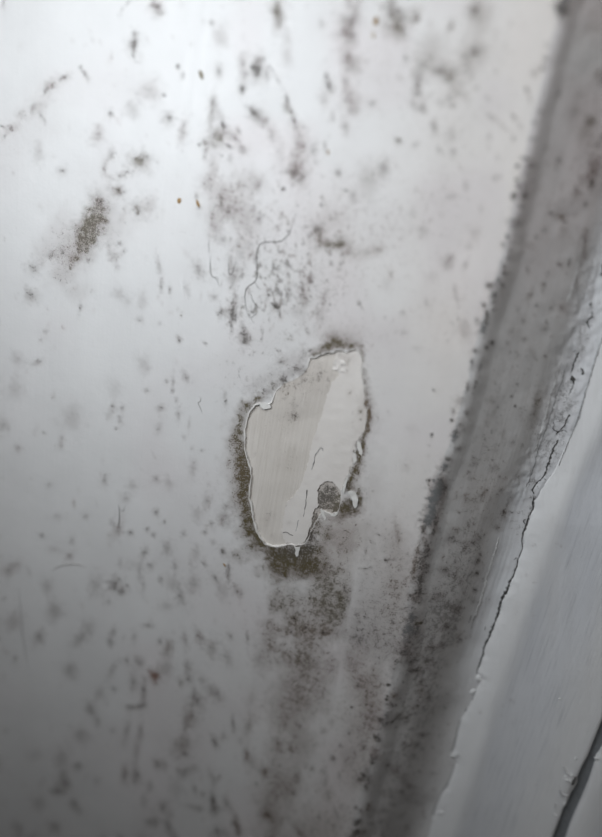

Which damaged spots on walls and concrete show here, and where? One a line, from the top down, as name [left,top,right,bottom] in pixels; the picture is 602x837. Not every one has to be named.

water stain [555,0,569,19]
water stain [285,96,307,183]
water stain [49,198,109,281]
water stain [312,223,346,249]
water stain [218,301,250,343]
water stain [471,221,520,371]
peeling [228,335,372,577]
crack [469,302,602,671]
water stain [261,457,451,790]